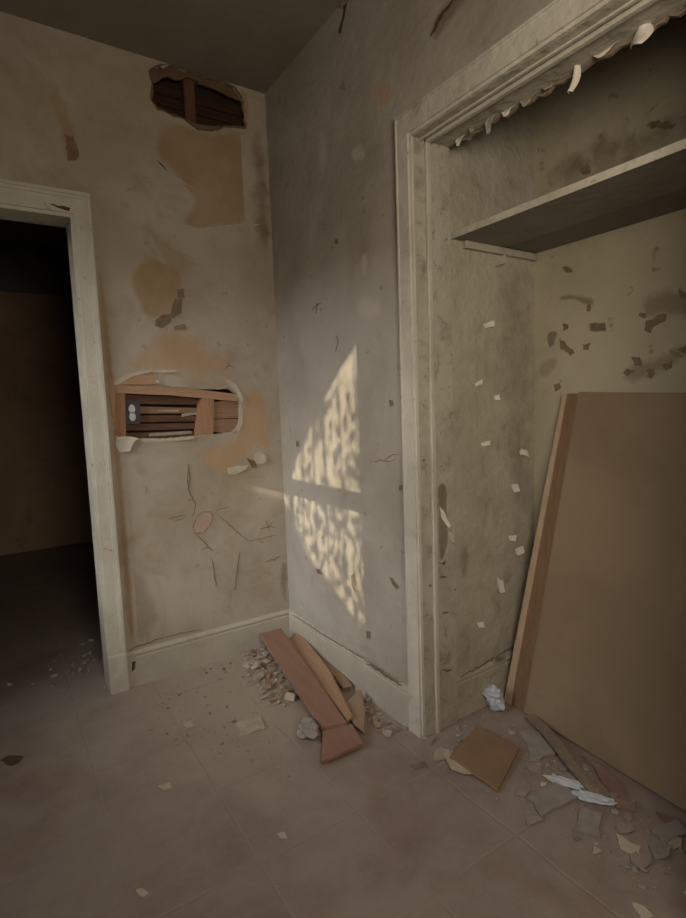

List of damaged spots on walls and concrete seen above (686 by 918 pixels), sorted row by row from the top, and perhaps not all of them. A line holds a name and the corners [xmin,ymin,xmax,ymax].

peeling [449,6,686,148]
peeling [127,253,187,330]
peeling [589,322,606,332]
spalling [109,370,244,452]
crack [170,464,280,590]
peeling [507,534,524,556]